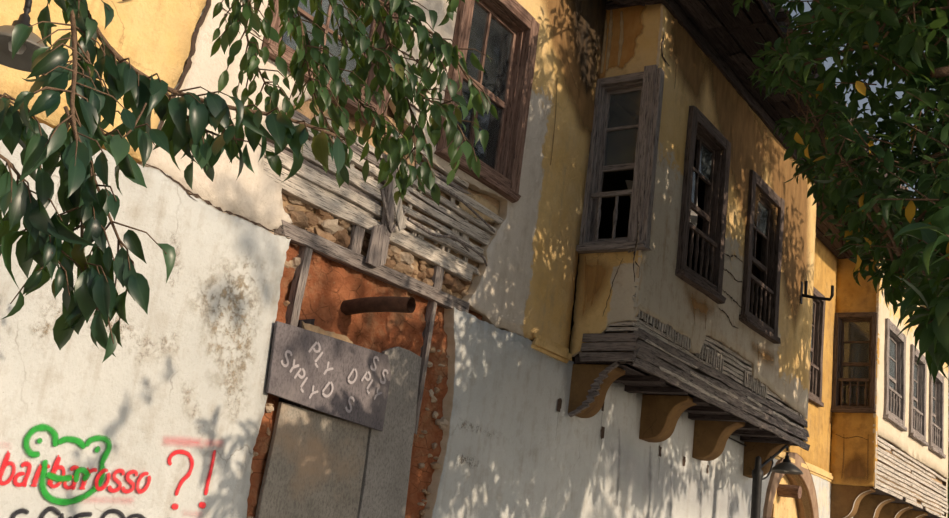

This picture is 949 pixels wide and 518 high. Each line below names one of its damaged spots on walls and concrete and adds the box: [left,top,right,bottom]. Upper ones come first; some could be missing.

peeling [598,0,646,79]
mould [202,266,253,394]
spalling [263,98,504,518]
crack [603,222,640,315]
spalling [247,393,279,518]